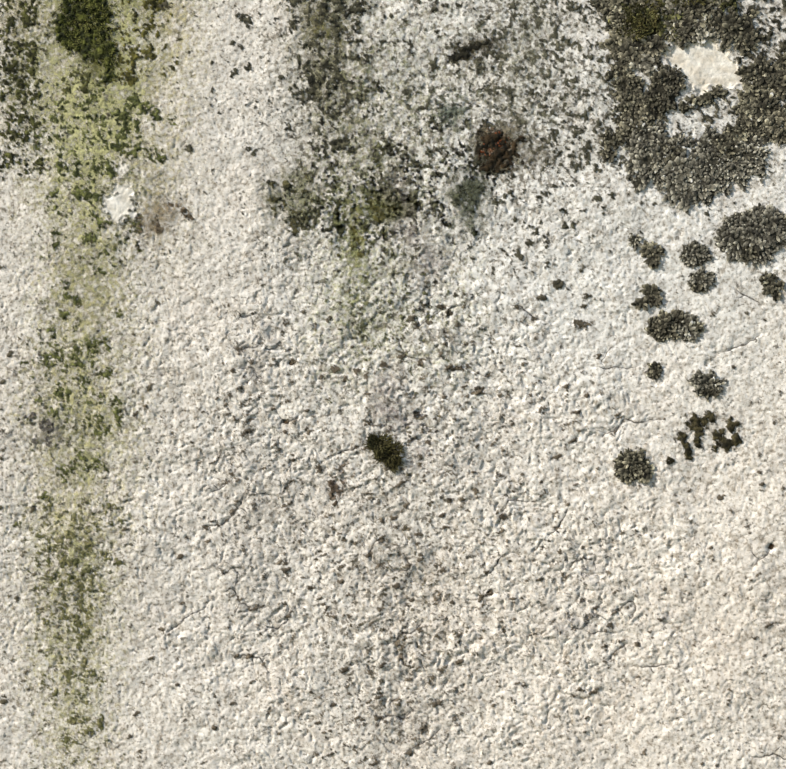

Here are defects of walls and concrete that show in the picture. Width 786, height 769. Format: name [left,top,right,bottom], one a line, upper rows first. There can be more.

mould [445,39,500,62]
corrosion [474,121,545,173]
damp [137,202,194,235]
damp [23,0,172,594]